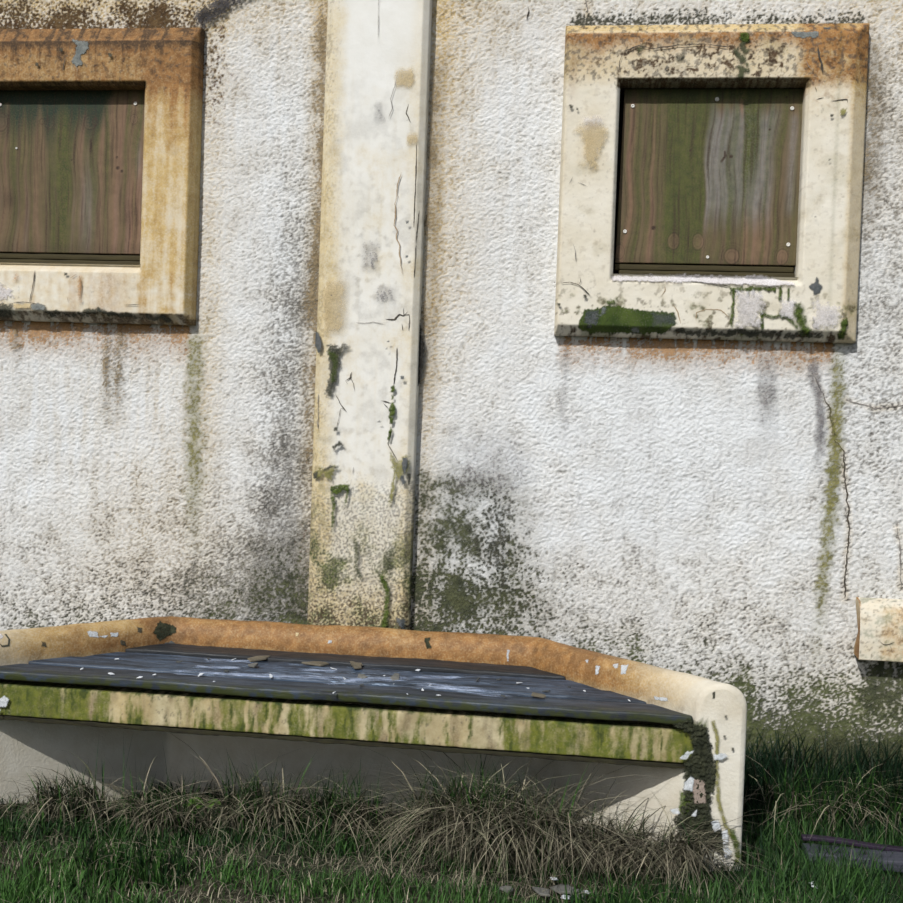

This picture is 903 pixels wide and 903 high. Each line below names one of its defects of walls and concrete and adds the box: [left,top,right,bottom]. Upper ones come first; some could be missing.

peeling [0,284,45,311]
peeling [611,274,796,329]
peeling [809,277,841,329]
leakage [808,364,826,451]
spalling [400,457,411,485]
crack [814,376,903,596]
spalling [671,719,734,857]